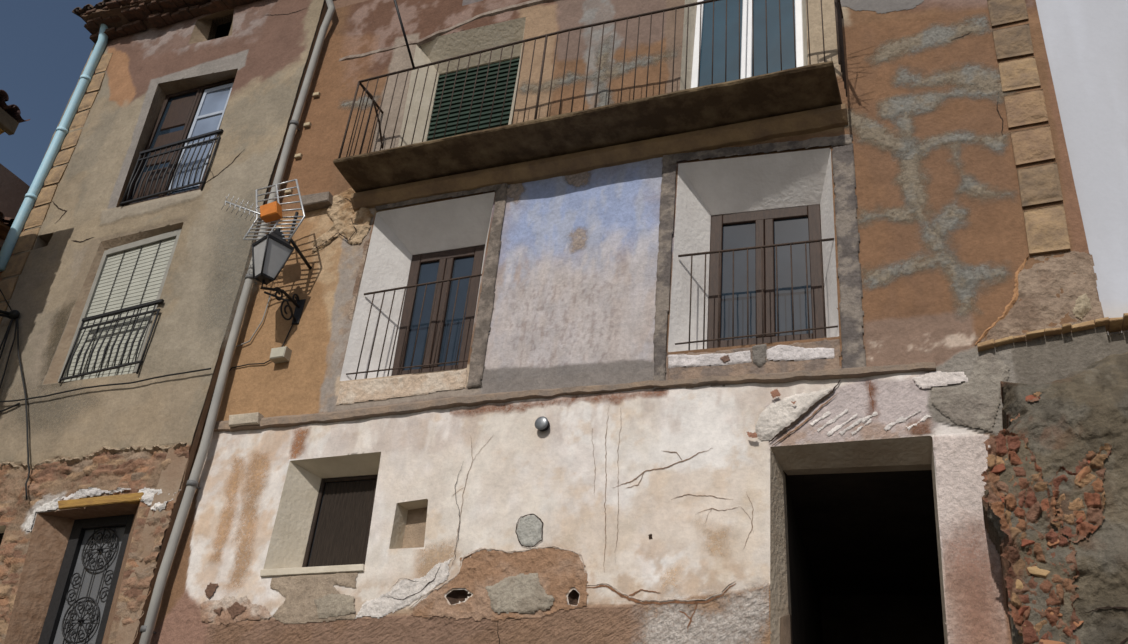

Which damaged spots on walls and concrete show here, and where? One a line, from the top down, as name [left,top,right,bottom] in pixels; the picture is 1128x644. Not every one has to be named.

spalling [309,188,373,320]
spalling [0,442,186,470]
peeling [24,487,176,532]
peeling [354,470,588,621]
crack [586,409,736,633]
crack [671,494,754,545]
spalling [981,392,1112,644]